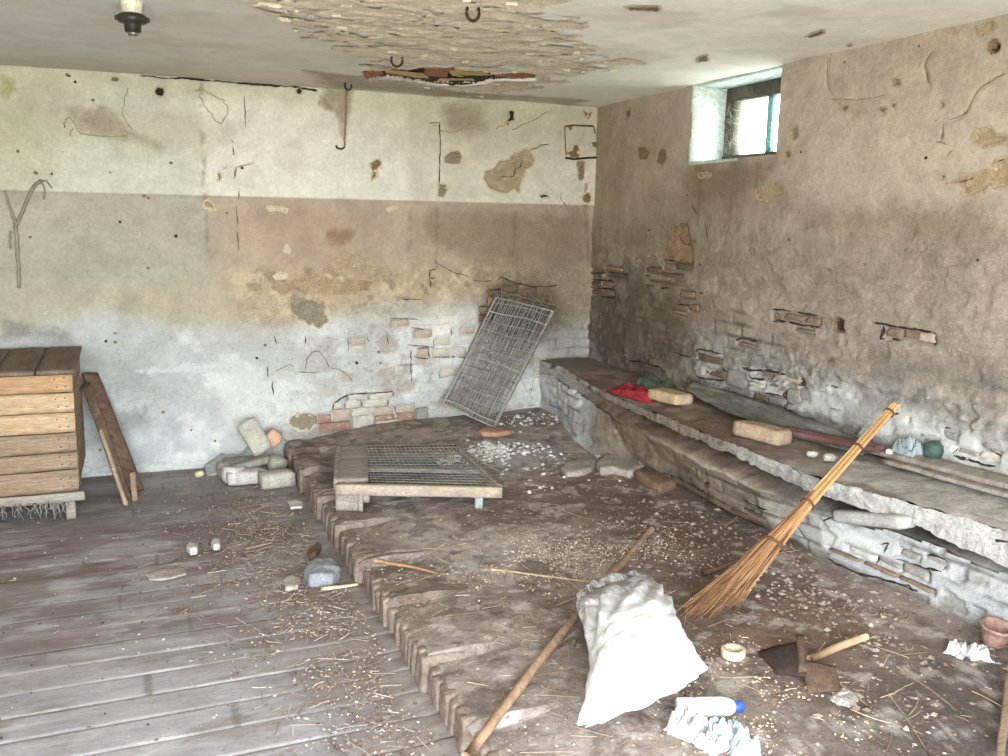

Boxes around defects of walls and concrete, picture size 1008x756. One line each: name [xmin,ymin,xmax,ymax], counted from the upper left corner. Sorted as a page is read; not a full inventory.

peeling [234,0,650,98]
crack [827,59,887,100]
crack [936,73,1006,155]
crack [140,75,317,250]
crack [431,122,441,183]
peeling [483,144,549,194]
peeling [939,125,1008,198]
peeling [645,222,703,315]
crack [347,261,557,395]
flaking render [772,308,845,335]
flaking render [874,322,937,344]
flaking render [288,392,428,435]